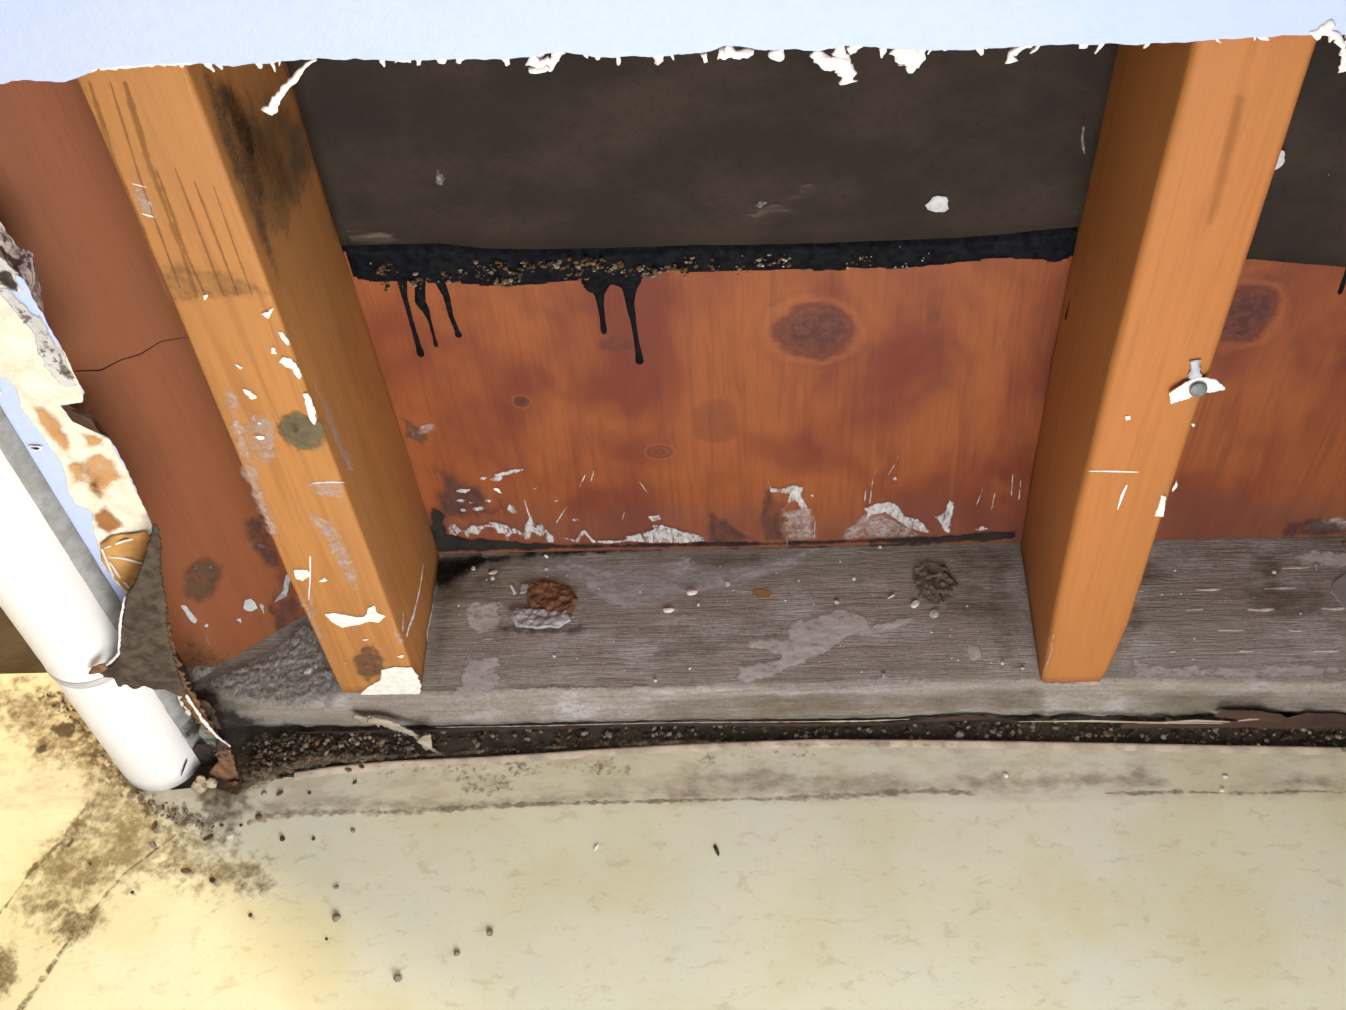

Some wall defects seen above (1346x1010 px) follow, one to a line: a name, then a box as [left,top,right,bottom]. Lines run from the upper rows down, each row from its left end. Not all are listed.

leakage [594,293,607,334]
leakage [622,286,644,365]